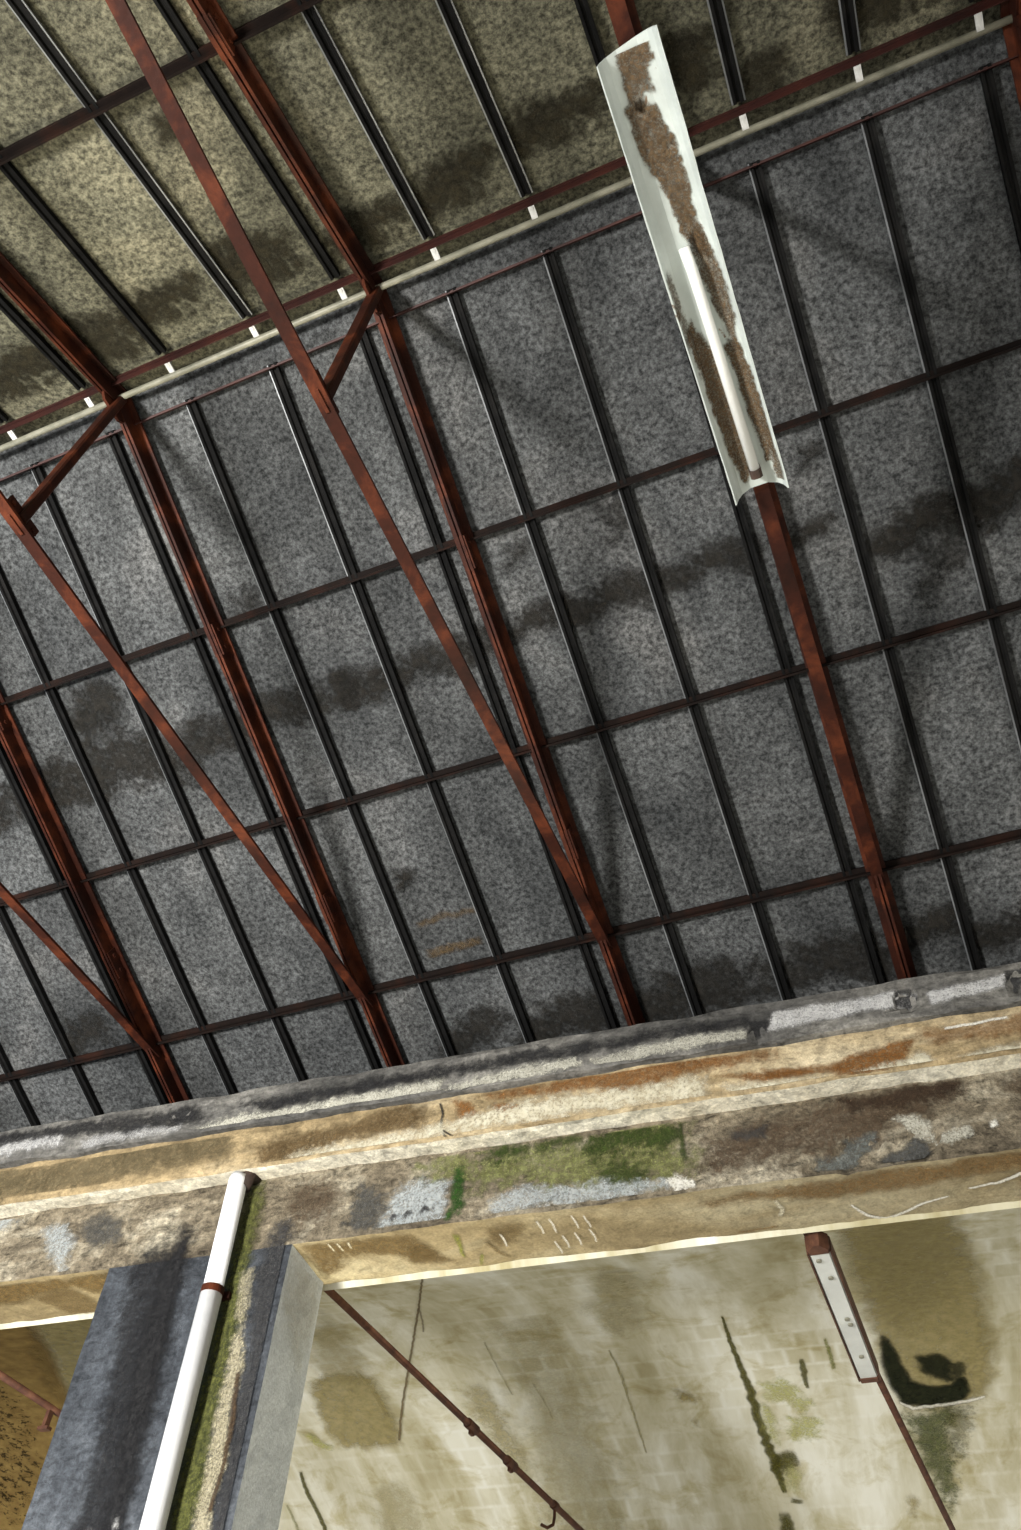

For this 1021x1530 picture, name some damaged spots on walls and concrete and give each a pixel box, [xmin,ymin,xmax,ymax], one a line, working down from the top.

water stain [661,26,720,93]
water stain [504,79,607,158]
water stain [65,230,304,362]
corrosion [615,42,784,483]
water stain [506,537,762,645]
water stain [39,680,250,808]
water stain [865,1053,932,1071]
water stain [704,1078,968,1173]
water stain [444,1168,464,1220]
water stain [721,1317,787,1492]
water stain [799,1359,809,1388]
water stain [842,1196,993,1509]